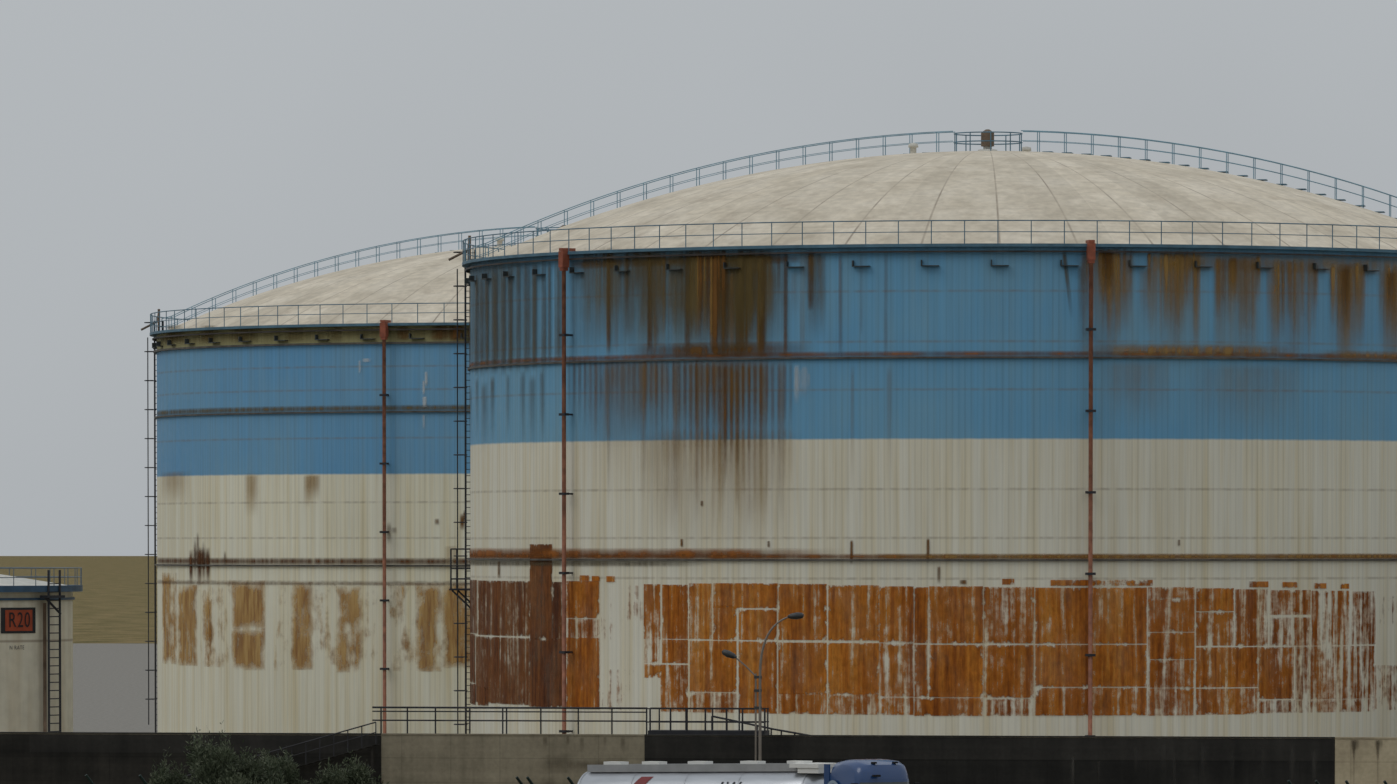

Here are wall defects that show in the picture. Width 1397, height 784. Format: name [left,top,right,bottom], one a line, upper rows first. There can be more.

corrosion [1087,252,1125,303]
corrosion [1148,253,1237,310]
corrosion [1324,262,1397,325]
corrosion [469,254,826,432]
corrosion [1116,346,1397,359]
corrosion [158,538,1397,716]